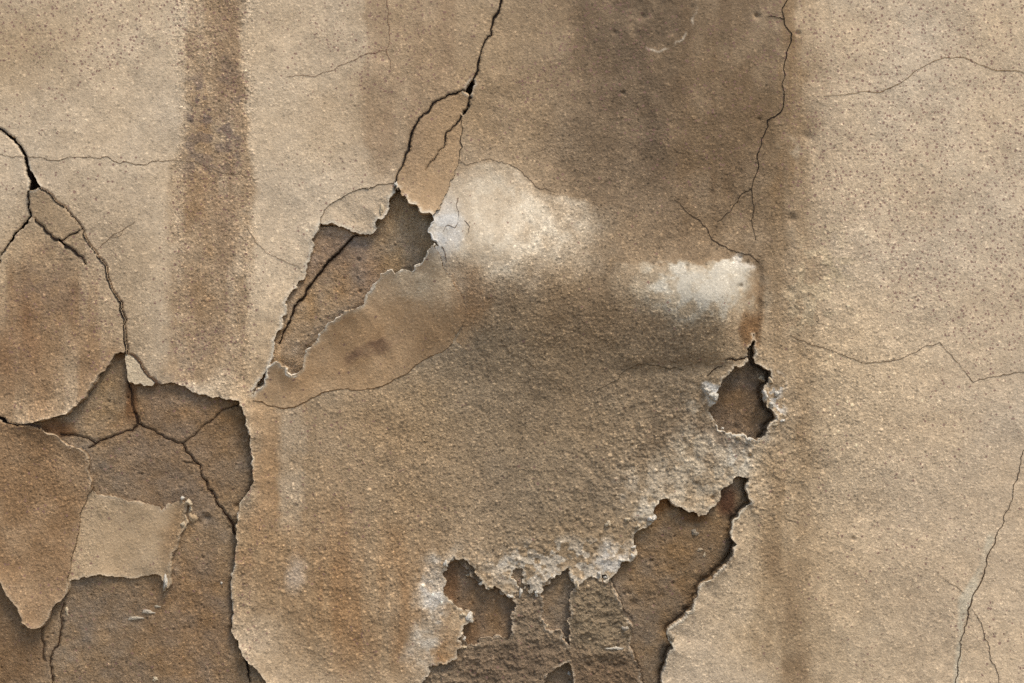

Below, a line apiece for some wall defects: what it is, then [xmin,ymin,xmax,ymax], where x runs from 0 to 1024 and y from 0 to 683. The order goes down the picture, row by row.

flaking render [0,187,266,683]
water stain [153,0,263,393]
crack [0,128,446,535]
flaking render [252,91,469,395]
crack [320,0,554,261]
water stain [234,0,870,683]
flaking render [422,476,753,683]
crack [674,0,792,263]
flaking render [703,334,785,442]
crack [950,450,1024,683]